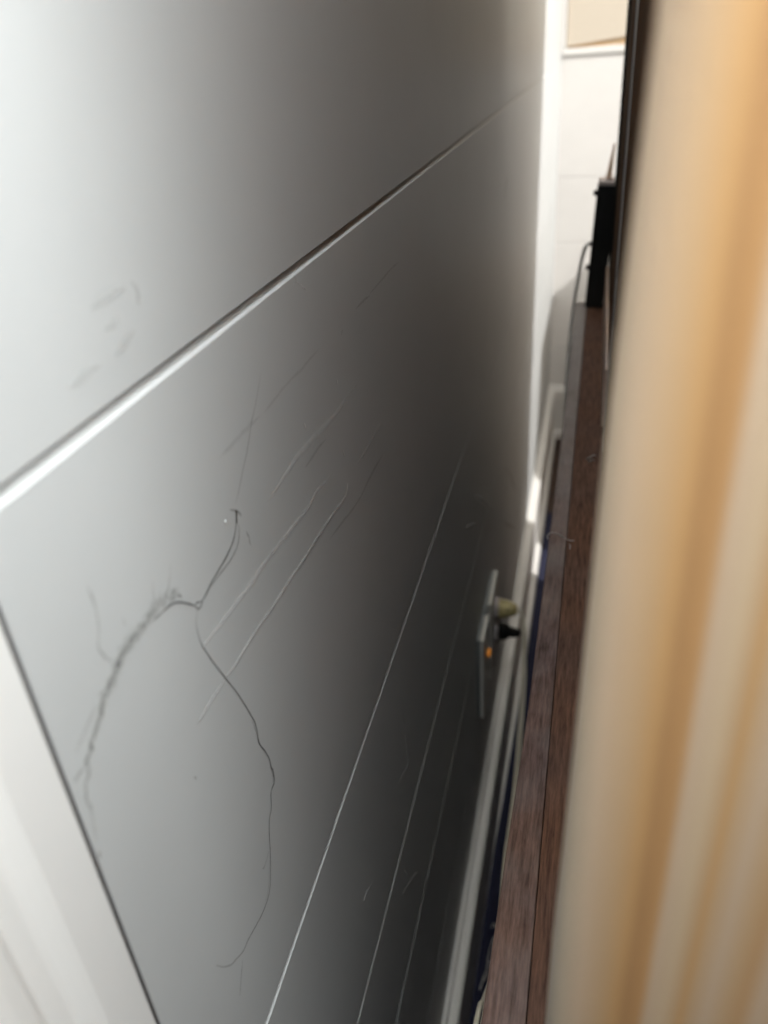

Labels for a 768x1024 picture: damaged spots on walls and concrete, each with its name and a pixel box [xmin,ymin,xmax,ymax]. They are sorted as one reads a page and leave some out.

crack [156,510,250,618]
crack [198,635,275,962]